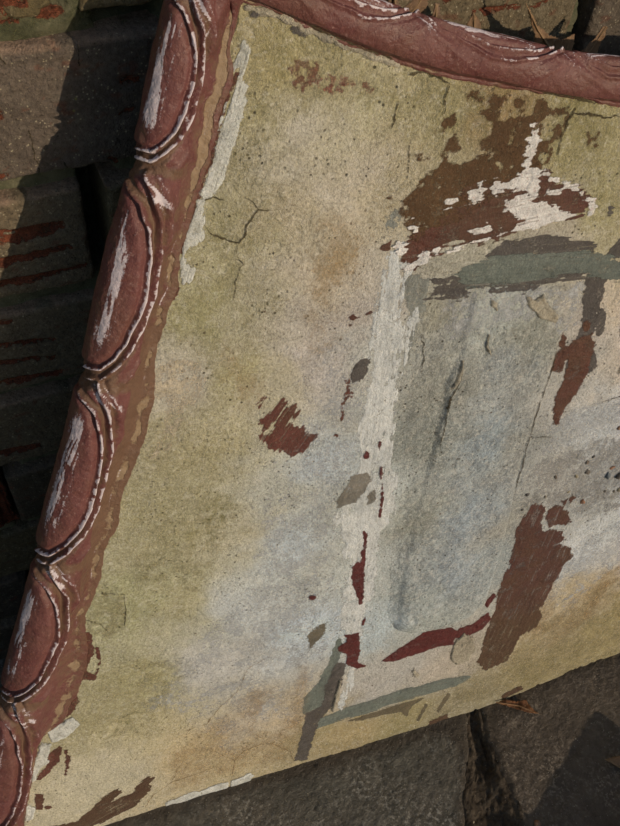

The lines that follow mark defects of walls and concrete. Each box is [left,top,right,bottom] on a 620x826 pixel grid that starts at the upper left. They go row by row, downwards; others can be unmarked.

peeling [180,40,251,285]
crack [206,198,271,298]